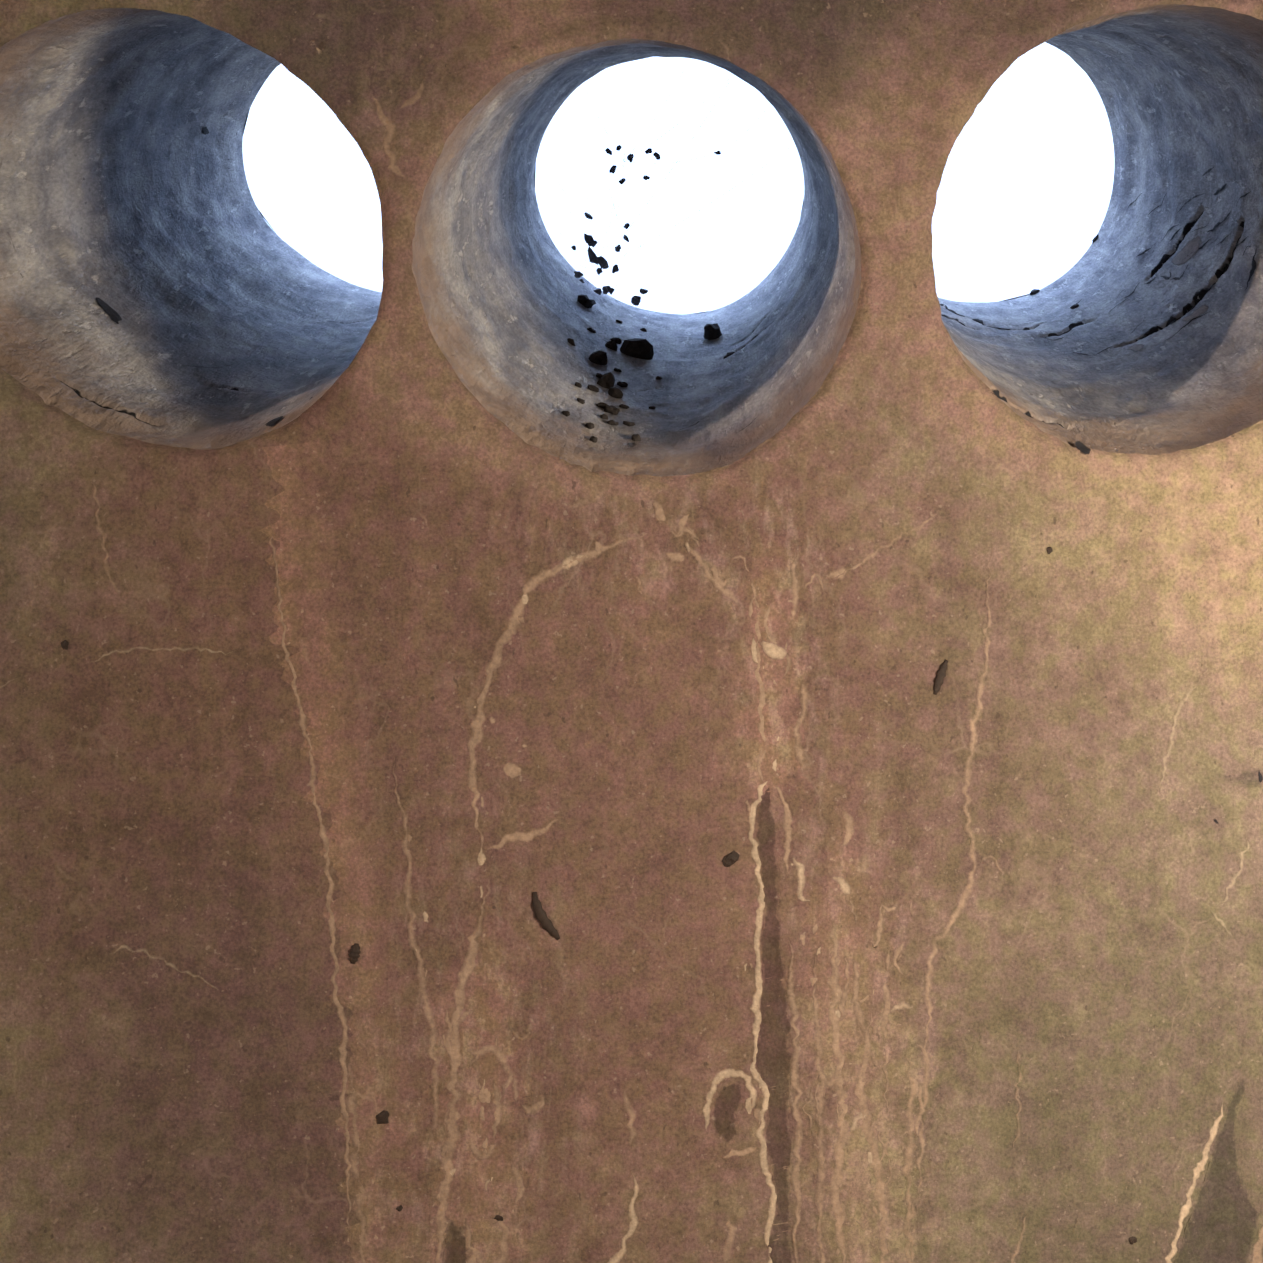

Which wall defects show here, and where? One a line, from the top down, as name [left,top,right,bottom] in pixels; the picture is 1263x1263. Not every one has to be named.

water stain [702,809,971,1263]